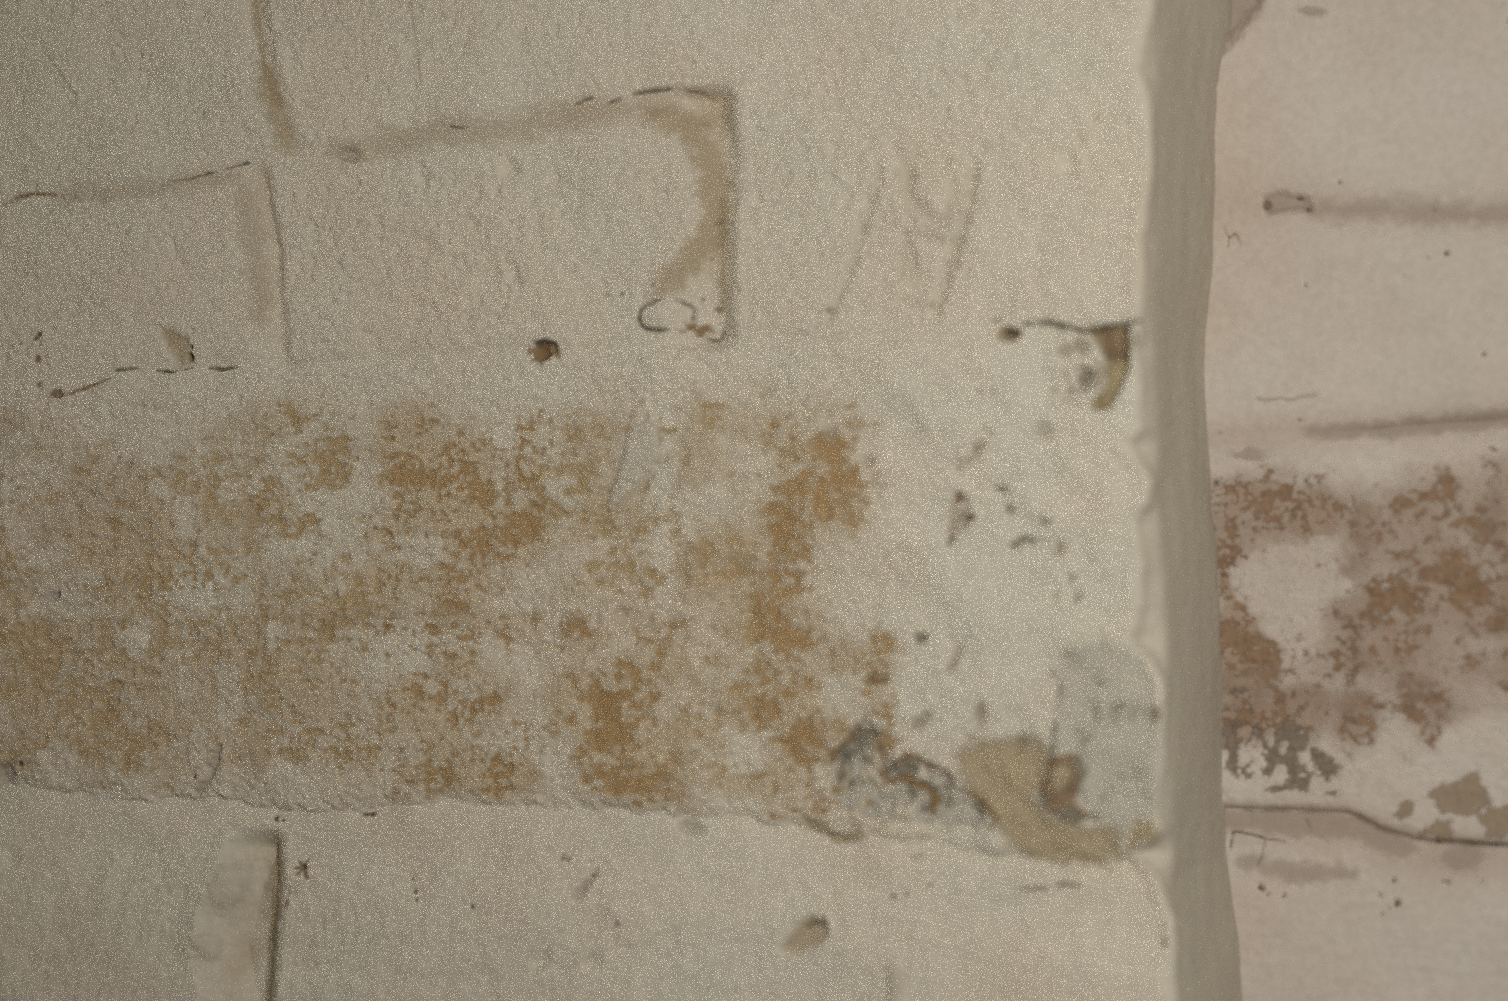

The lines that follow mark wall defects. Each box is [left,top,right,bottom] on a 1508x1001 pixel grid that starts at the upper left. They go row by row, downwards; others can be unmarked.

spalling [1053,326,1132,409]
peeling [0,399,930,842]
peeling [1212,457,1508,755]
flaking render [957,706,1158,864]
peeling [1265,783,1297,793]
peeling [1394,772,1508,842]